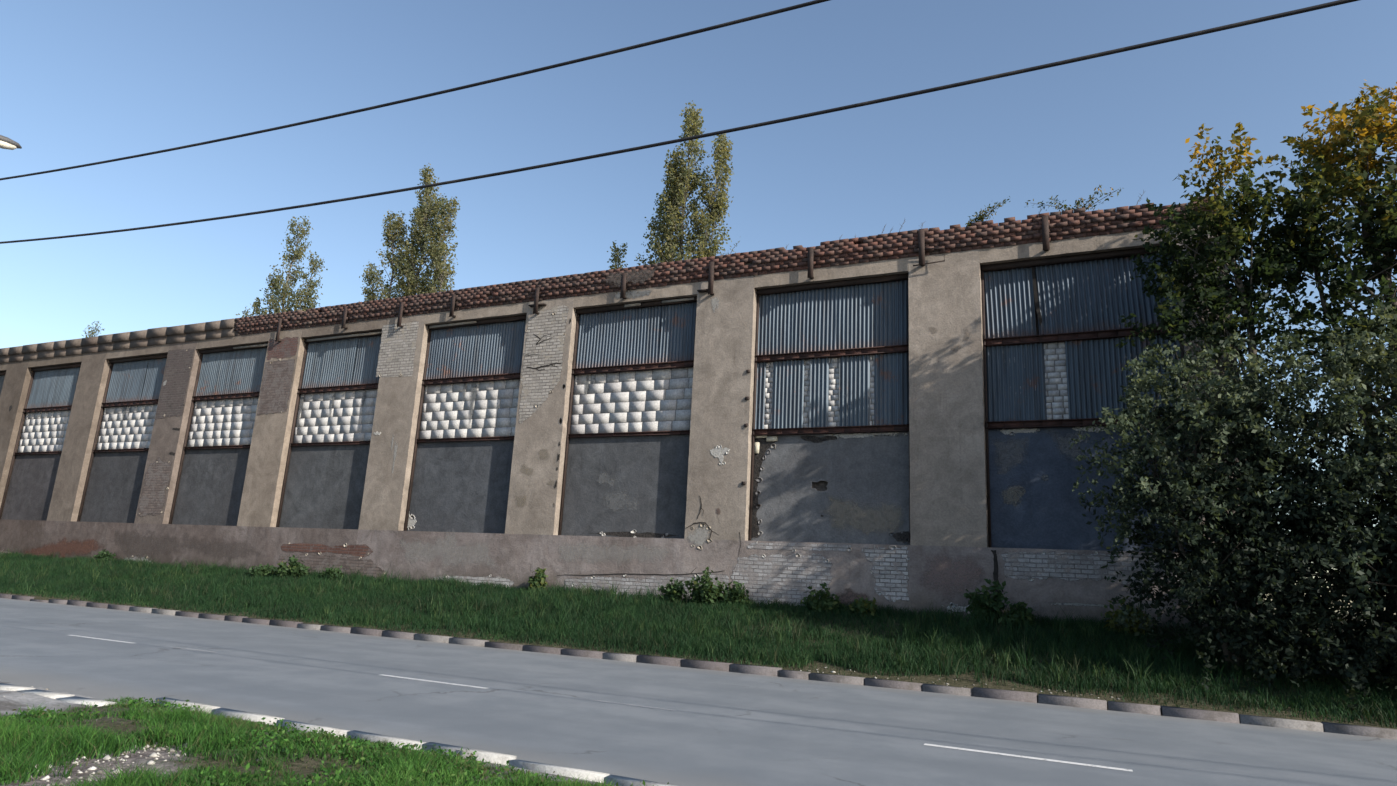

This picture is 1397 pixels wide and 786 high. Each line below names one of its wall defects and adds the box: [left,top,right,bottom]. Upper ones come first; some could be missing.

flaking render [376,321,419,377]
flaking render [519,305,571,423]
flaking render [277,543,389,579]
flaking render [564,435,910,607]